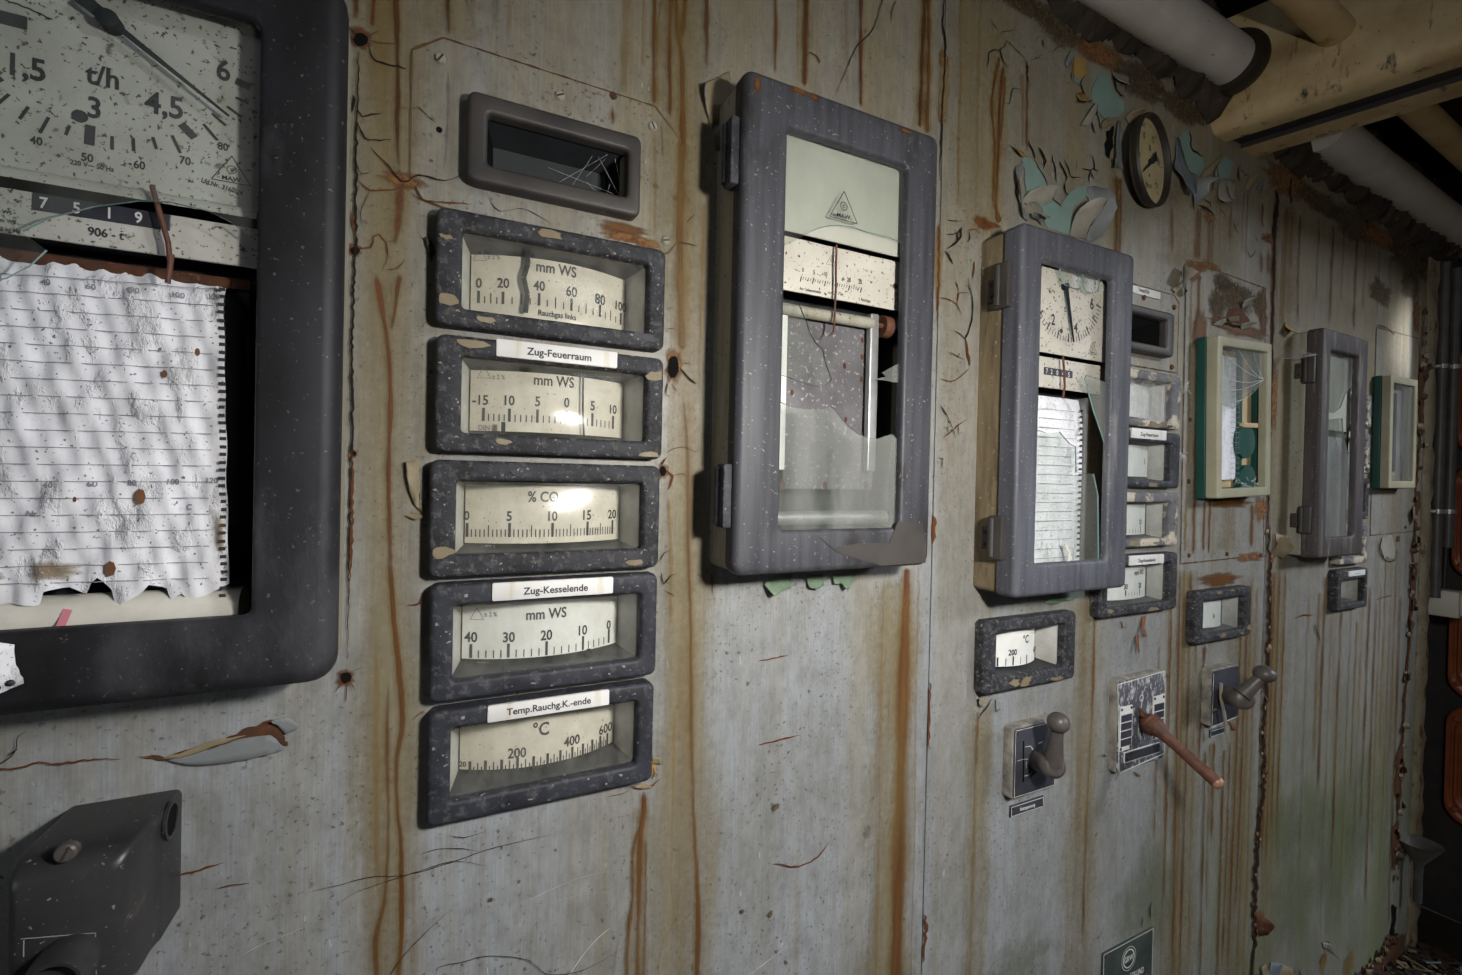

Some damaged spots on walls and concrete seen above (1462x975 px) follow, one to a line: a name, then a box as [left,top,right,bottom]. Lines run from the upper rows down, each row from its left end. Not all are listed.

rust [383,0,703,381]
peeling [1014,143,1117,242]
peeling [1065,49,1146,169]
peeling [1174,129,1279,210]
rust [374,277,405,975]
rust [1131,196,1301,971]
crack [0,732,119,770]
peeling [138,717,299,765]
rust [892,569,909,975]
rust [626,795,647,975]
rust [693,806,701,975]
peeling [1358,905,1406,975]